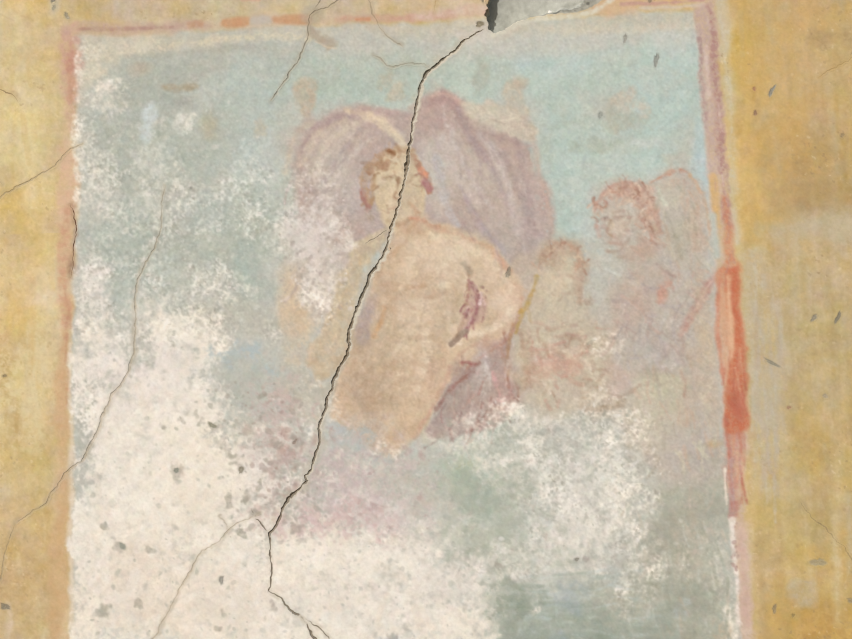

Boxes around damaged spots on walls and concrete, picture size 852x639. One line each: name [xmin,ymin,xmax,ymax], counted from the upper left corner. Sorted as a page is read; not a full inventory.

flaking render [450,0,605,55]
crack [0,87,19,104]
crack [0,142,85,201]
crack [149,0,485,639]
crack [0,185,167,585]